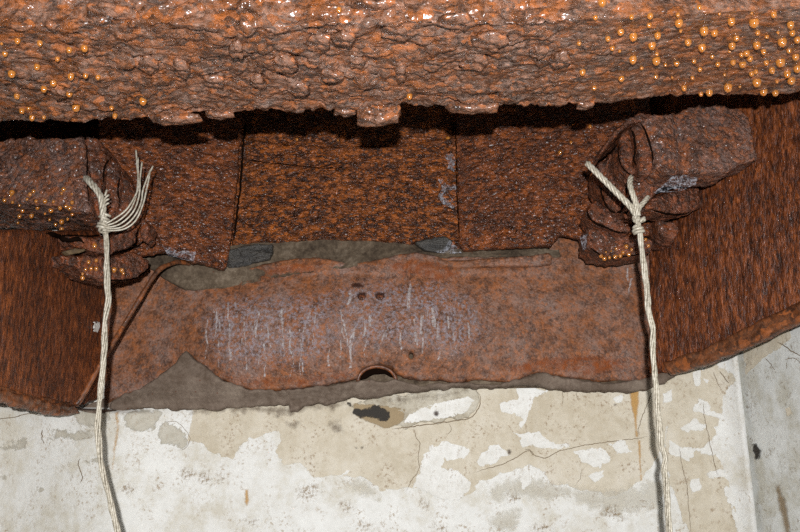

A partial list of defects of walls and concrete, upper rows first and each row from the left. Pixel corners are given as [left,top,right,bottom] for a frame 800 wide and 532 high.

corrosion [306,29,366,70]
corrosion [434,12,509,72]
corrosion [529,44,571,69]
corrosion [150,108,235,126]
corrosion [334,104,402,127]
corrosion [444,102,499,115]
corrosion [576,101,595,110]
peeling [0,389,110,441]
peeling [122,361,744,532]
crack [395,394,481,491]
crack [478,391,653,472]
corrosion [630,391,638,422]